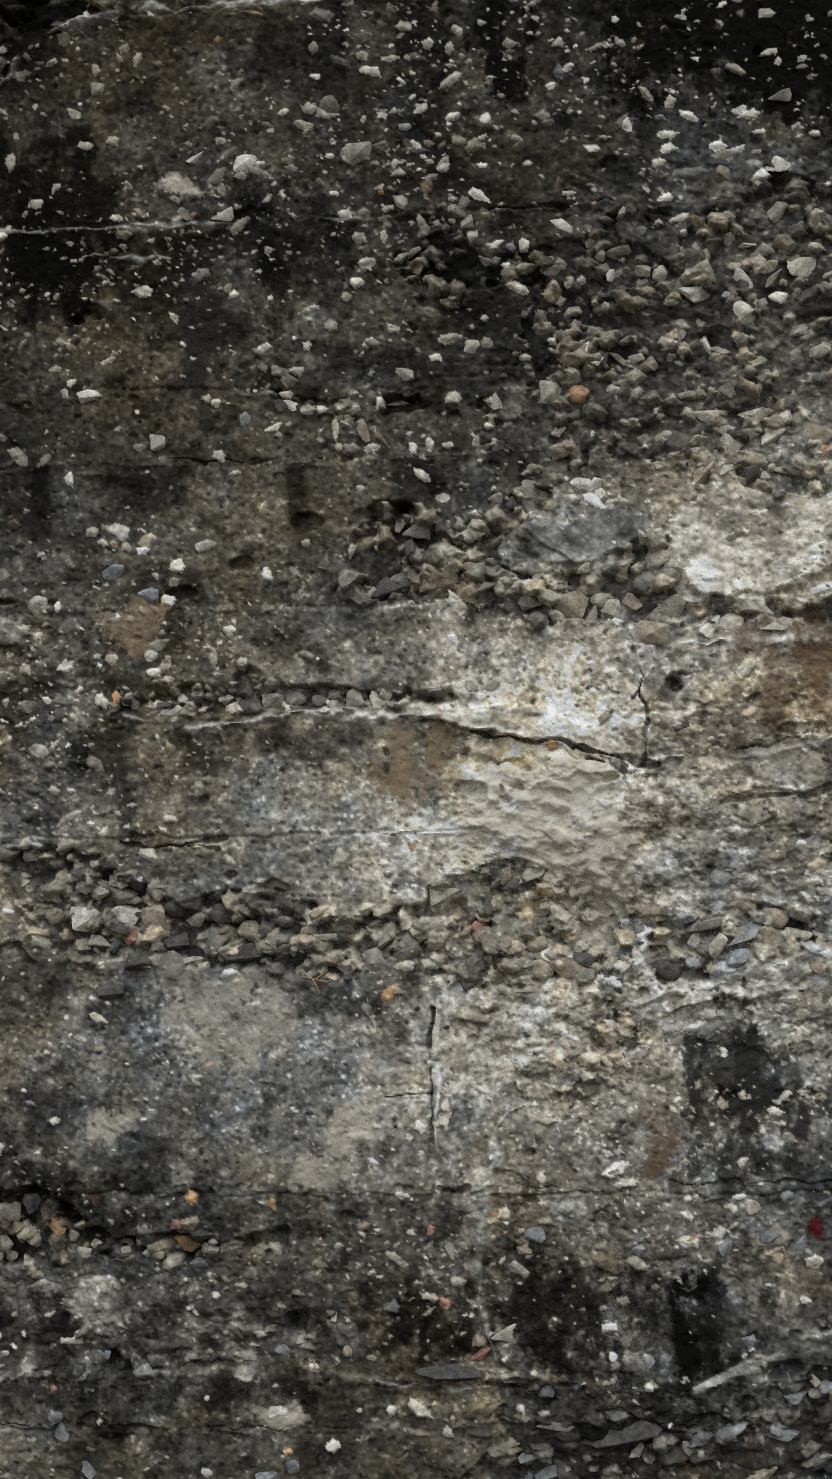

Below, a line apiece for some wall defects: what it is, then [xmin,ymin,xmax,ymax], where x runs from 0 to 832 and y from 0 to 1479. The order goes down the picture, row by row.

spalling [337,120,832,632]
crack [469,646,662,772]
crack [119,834,229,854]
spalling [0,772,832,1016]
spalling [0,1181,376,1381]
spalling [476,1366,832,1479]